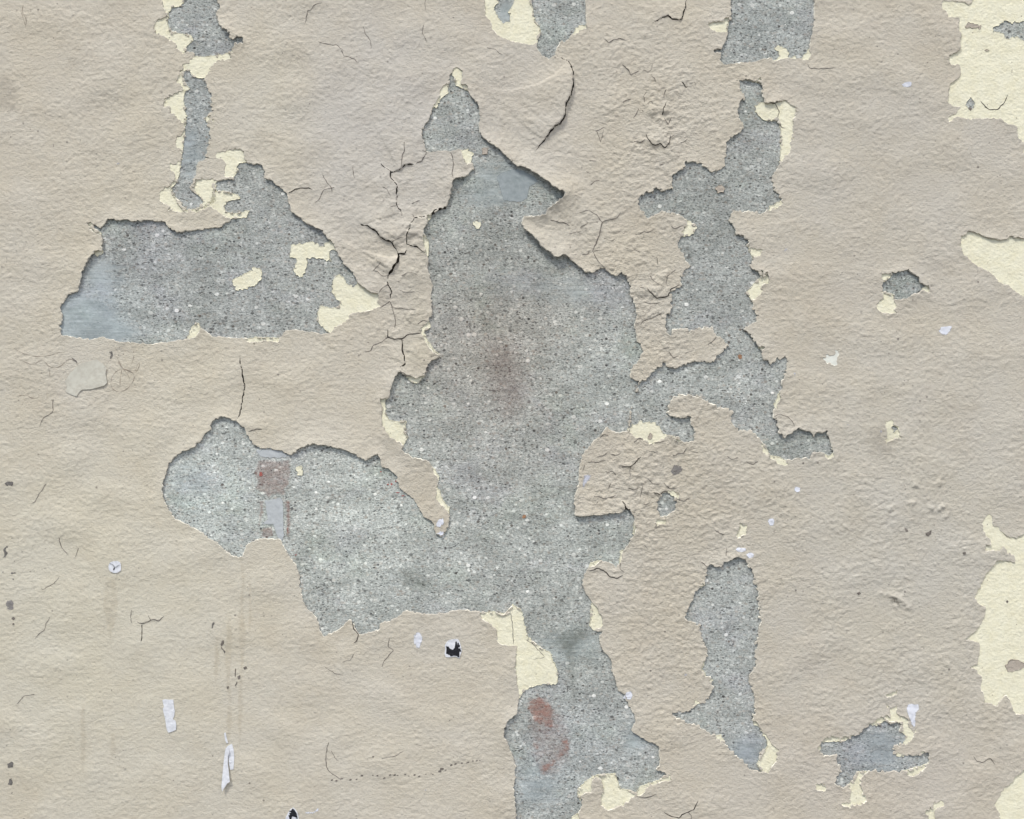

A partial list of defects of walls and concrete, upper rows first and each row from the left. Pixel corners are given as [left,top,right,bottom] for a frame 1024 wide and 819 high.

peeling [58,0,380,345]
crack [537,58,574,149]
peeling [942,0,1024,153]
crack [361,142,454,376]
peeling [877,269,930,314]
peeling [959,230,1024,296]
crack [238,361,262,432]
peeling [161,0,835,819]
peeling [965,514,1024,715]
peeling [816,689,930,819]